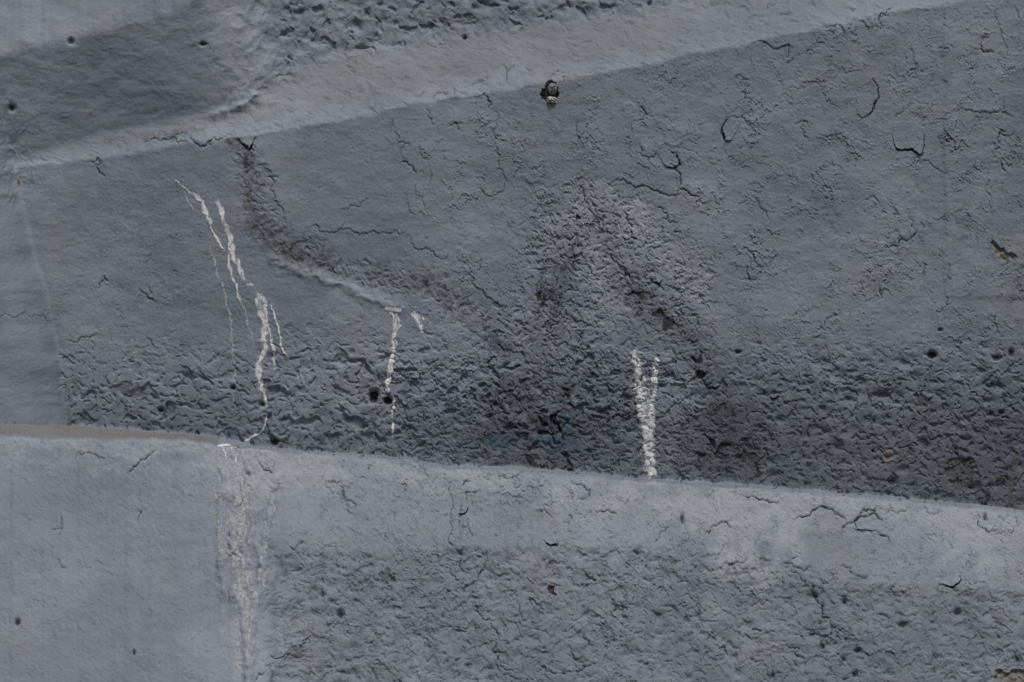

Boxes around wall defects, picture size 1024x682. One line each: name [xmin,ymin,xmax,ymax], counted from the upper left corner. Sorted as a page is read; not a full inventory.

crack [826,4,893,33]
crack [144,132,284,213]
crack [390,63,514,207]
spalling [540,80,559,104]
crack [612,107,700,223]
crack [571,190,637,284]
spalling [990,237,1017,265]
damp [175,180,293,442]
efflorescence [385,307,424,437]
damp [624,279,766,478]
efflorescence [213,443,276,675]
crack [746,492,940,559]